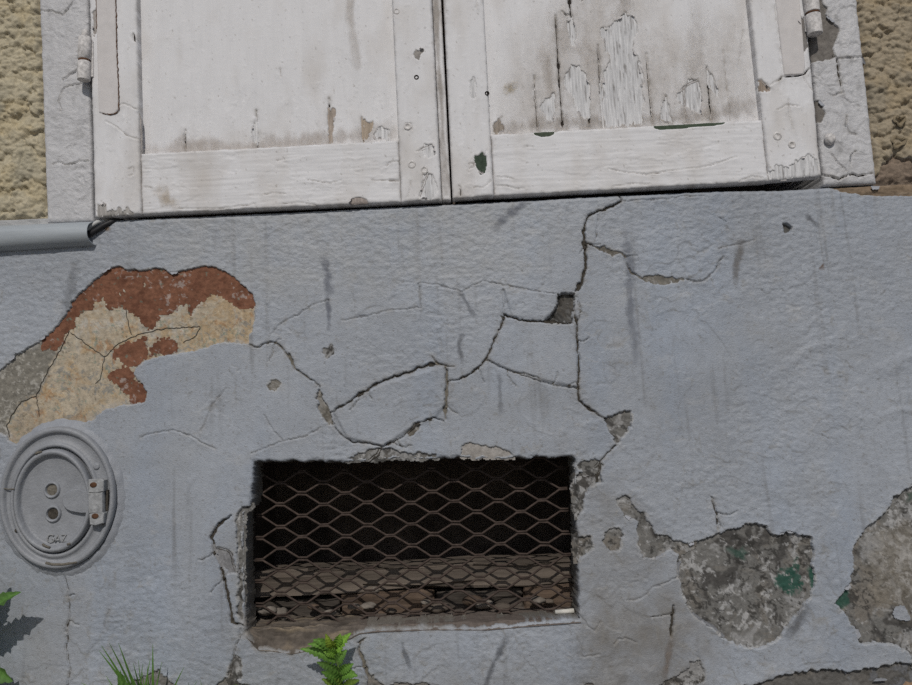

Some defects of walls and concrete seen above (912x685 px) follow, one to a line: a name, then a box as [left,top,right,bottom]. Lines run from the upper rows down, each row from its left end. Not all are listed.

peeling [654,70,725,130]
spalling [0,266,256,444]
crack [253,300,329,381]
crack [268,161,715,462]
spalling [569,459,603,520]
crack [594,445,616,482]
crack [204,515,240,675]
spalling [571,528,623,565]
crack [651,605,674,636]
spalling [616,495,814,648]
spalling [754,484,912,685]
crack [354,638,371,685]